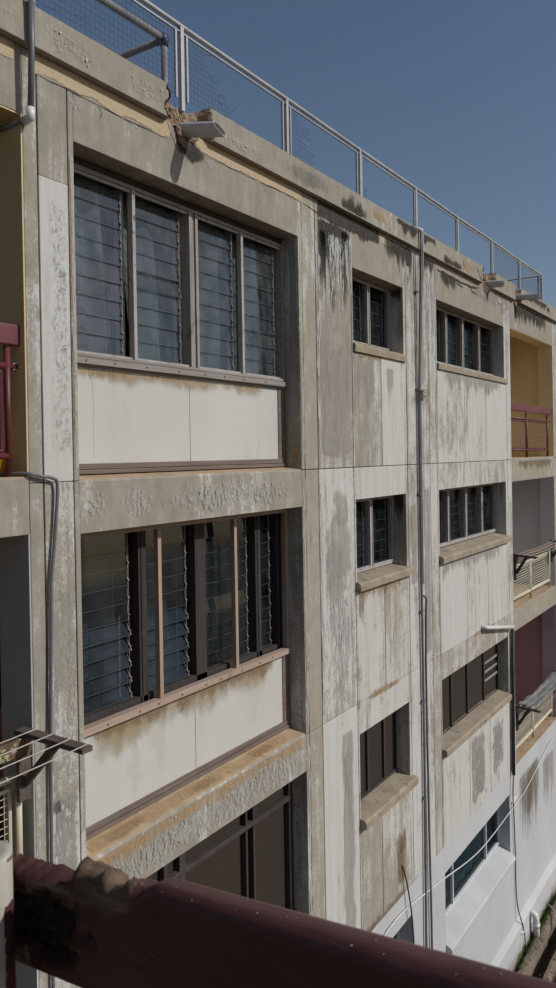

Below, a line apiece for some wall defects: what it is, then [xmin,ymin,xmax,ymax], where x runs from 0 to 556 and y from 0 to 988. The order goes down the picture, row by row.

crack [39,75,157,134]
crack [217,161,347,229]
peeling [35,53,317,469]
leakage [317,198,462,302]
peeling [315,233,351,456]
leakage [520,751,553,816]